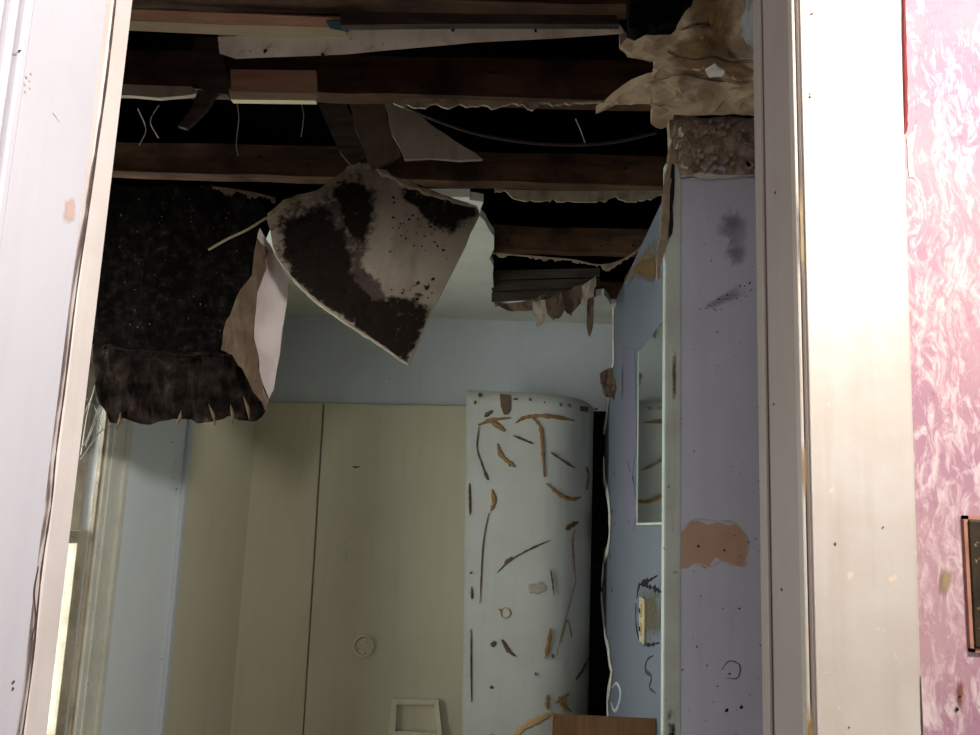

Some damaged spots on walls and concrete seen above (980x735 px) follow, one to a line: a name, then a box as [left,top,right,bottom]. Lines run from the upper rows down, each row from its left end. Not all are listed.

peeling [705,64,725,78]
flaking render [666,114,755,180]
water stain [392,183,477,251]
water stain [278,174,435,361]
peeling [681,518,750,569]